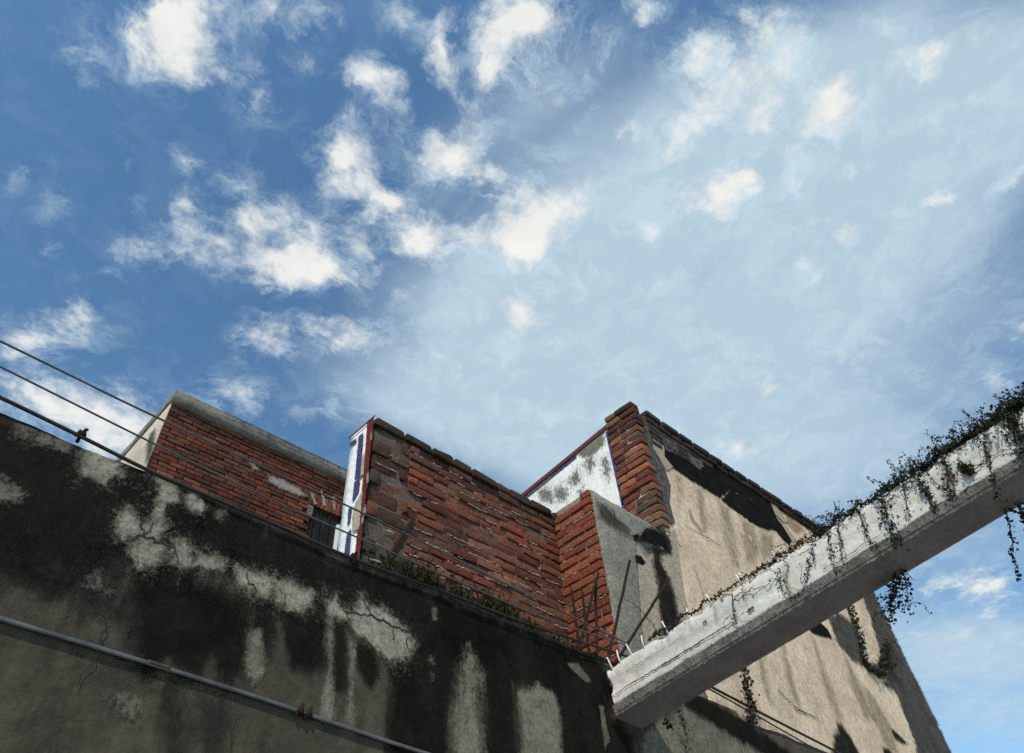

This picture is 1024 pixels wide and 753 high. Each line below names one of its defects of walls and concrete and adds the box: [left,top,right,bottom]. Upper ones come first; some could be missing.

crack [118,518,179,561]
leakage [0,412,634,753]
crack [342,596,412,648]